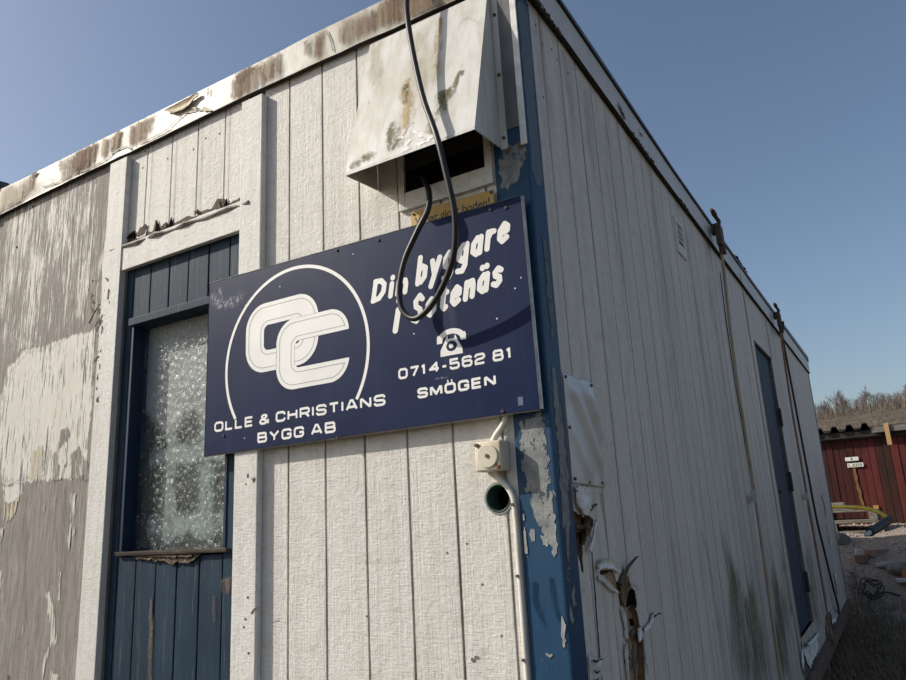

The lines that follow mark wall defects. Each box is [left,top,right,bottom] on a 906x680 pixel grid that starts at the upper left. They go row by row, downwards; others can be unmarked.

rust [304,31,323,57]
rust [339,0,450,43]
rust [230,56,280,98]
damp [386,79,411,150]
damp [428,71,461,134]
rust [58,113,155,182]
peeling [498,142,527,189]
rust [0,171,37,213]
peeling [3,483,25,504]
peeling [518,364,598,648]
peeling [597,558,649,680]
peeling [801,632,820,670]